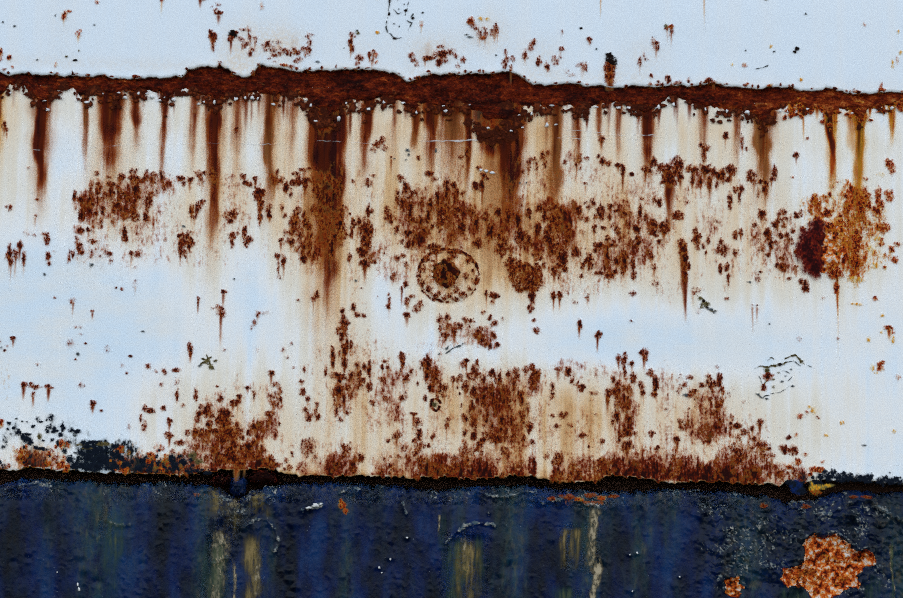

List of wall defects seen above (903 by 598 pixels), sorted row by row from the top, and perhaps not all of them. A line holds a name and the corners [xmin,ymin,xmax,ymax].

corrosion [465,16,499,41]
corrosion [0,25,903,322]
corrosion [211,289,227,338]
corrosion [1,439,70,473]
corrosion [21,381,54,403]
peeling [3,414,212,475]
corrosion [109,363,365,478]
corrosion [280,341,321,422]
corrosion [324,302,825,504]
corrosion [780,533,876,598]